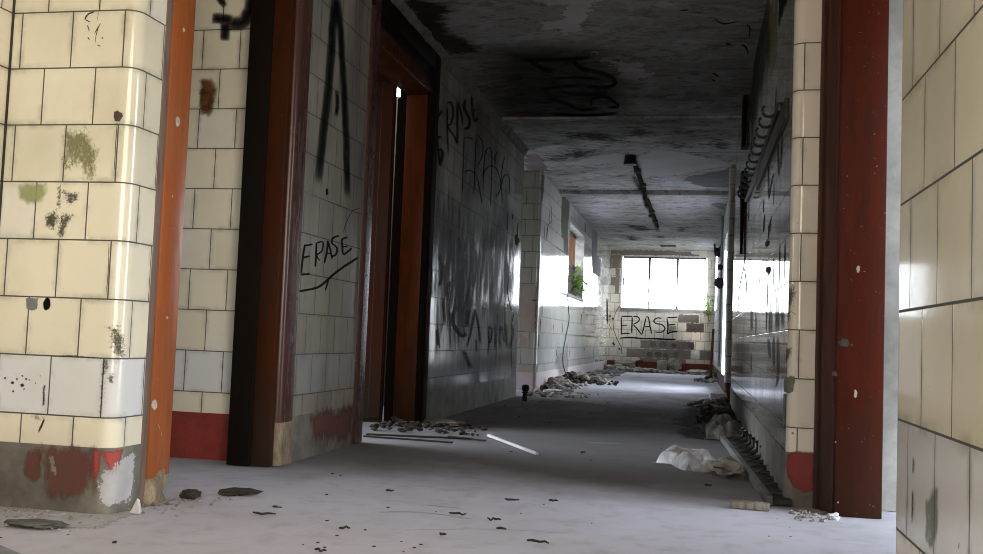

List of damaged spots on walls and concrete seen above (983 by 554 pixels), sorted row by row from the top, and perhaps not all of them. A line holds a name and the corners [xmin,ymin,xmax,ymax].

peeling [535,0,603,36]
peeling [310,404,354,441]
peeling [24,447,122,498]